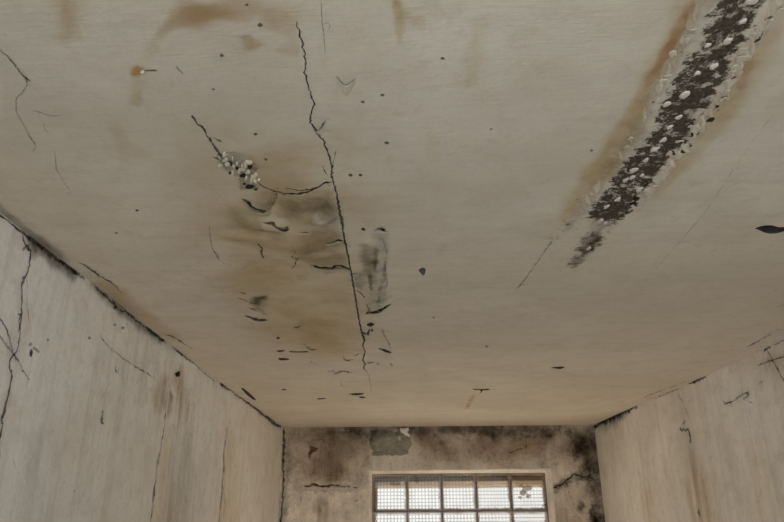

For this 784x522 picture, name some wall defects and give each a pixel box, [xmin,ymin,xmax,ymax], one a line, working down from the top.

crack [187,114,232,161]
spalling [544,0,784,240]
crack [249,19,379,392]
crack [0,238,31,438]
crack [749,338,784,385]
water stain [442,426,532,437]
crack [544,470,594,506]
water stain [574,405,638,522]